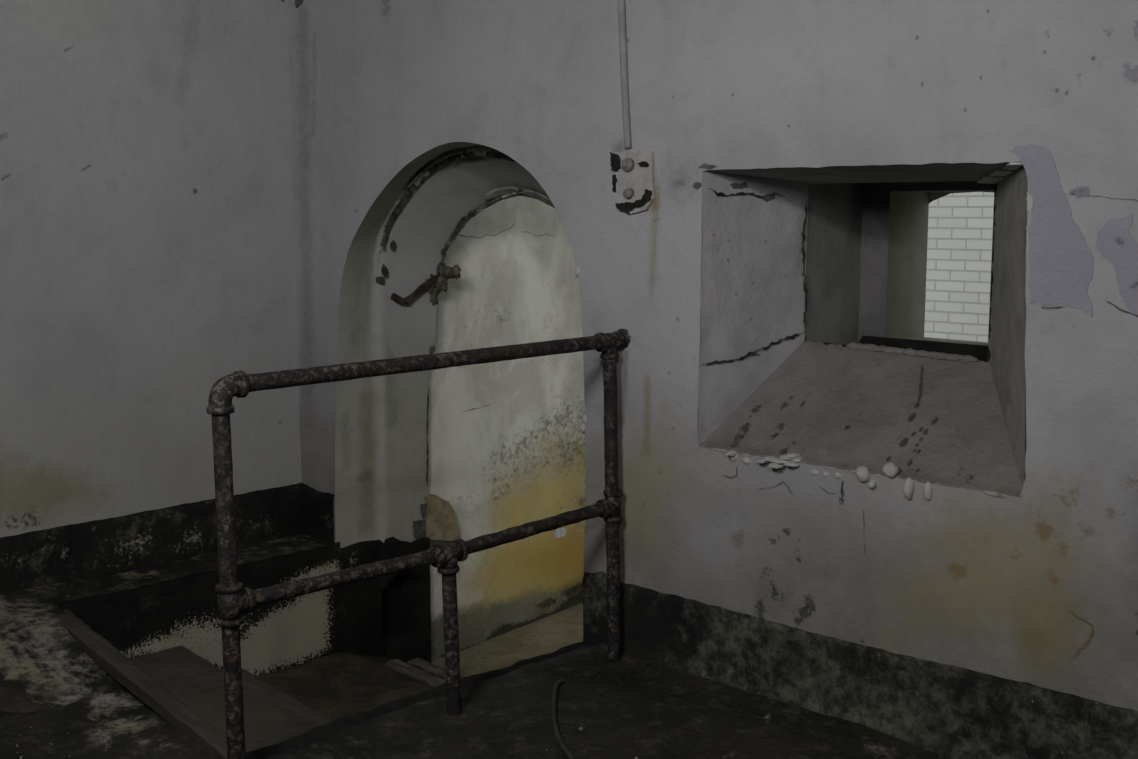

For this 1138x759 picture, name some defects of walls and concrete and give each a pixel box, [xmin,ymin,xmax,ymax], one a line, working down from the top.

flaking render [425,186,555,306]
crack [692,164,808,365]
peeling [977,143,1138,317]
damp [459,582,583,651]